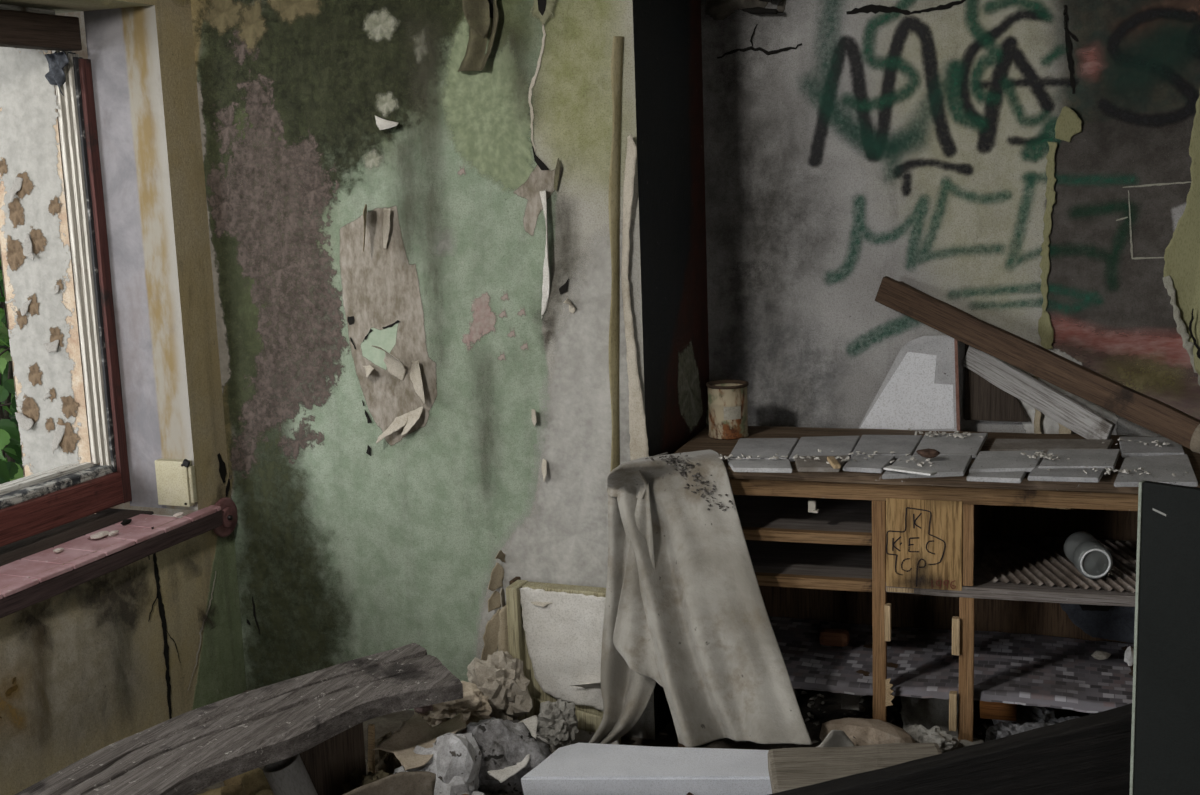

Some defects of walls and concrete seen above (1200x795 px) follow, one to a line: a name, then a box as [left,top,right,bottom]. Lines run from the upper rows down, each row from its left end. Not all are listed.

peeling [0,47,81,475]
flaking render [197,0,437,498]
leakage [196,0,462,691]
peeling [441,0,575,319]
crack [717,25,802,59]
crack [846,0,966,15]
peeling [1163,90,1200,386]
leakage [66,565,147,629]
crack [148,526,216,719]
peeling [481,550,506,661]